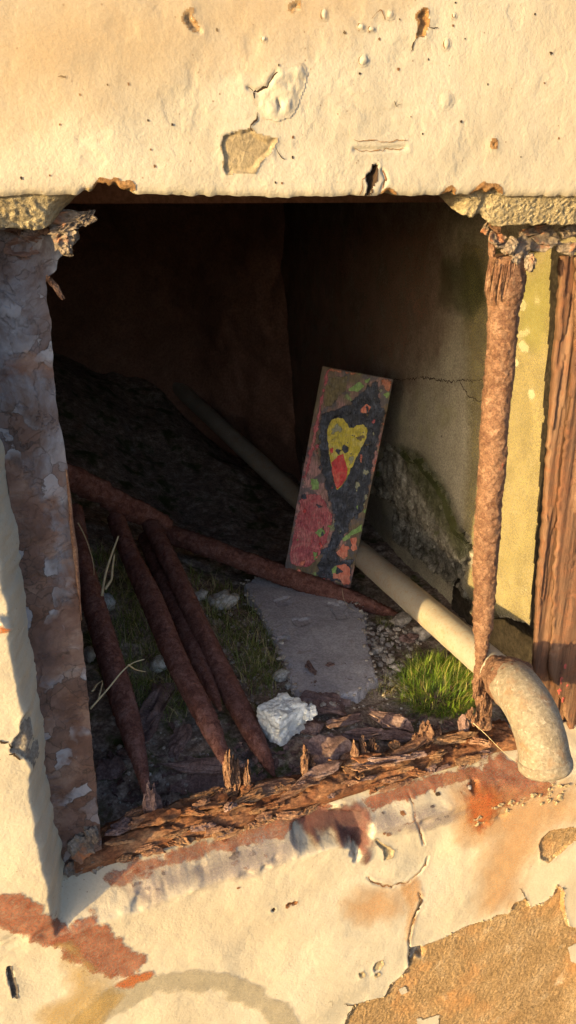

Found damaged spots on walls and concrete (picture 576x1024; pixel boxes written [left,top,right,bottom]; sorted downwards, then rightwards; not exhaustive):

peeling [411,7,439,51]
peeling [220,128,278,175]
crack [390,376,482,402]
spalling [373,440,474,626]
spalling [489,617,534,665]
rust [362,751,554,836]
crack [368,798,427,959]
peeling [539,827,576,863]
rust [0,893,146,980]
peeling [345,884,576,1024]